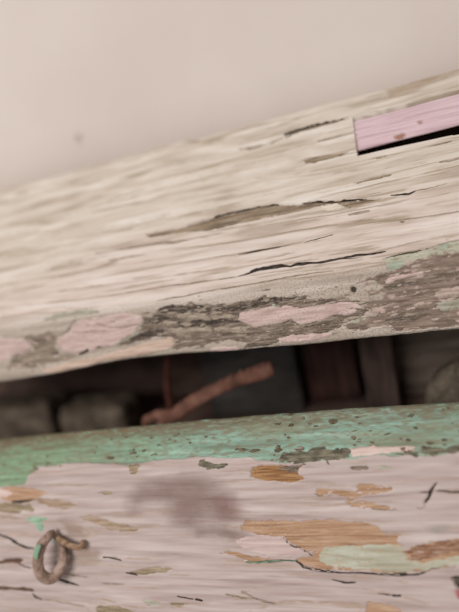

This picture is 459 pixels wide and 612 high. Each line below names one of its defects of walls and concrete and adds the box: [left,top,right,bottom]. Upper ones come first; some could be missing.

peeling [147,199,381,237]
crack [108,251,386,301]
peeling [0,239,459,375]
peeling [350,445,427,457]
peeling [251,465,304,483]
peeling [0,486,77,513]
peeling [315,484,397,511]
crack [416,483,459,509]
peeling [220,519,459,579]